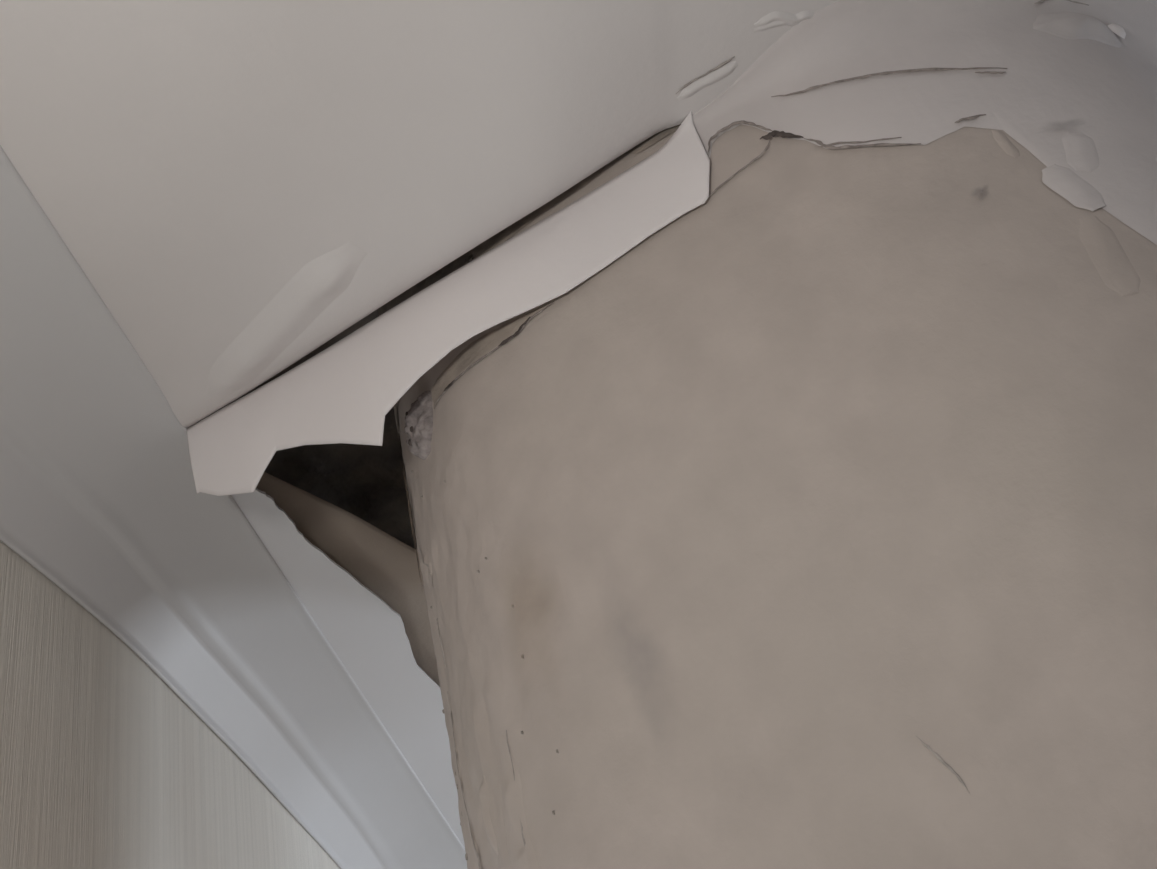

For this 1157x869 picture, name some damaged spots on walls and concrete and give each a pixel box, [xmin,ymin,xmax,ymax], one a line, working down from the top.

crack [771,67,1007,97]
crack [955,114,986,123]
crack [708,120,921,196]
peeling [187,111,710,588]
crack [447,691,483,869]